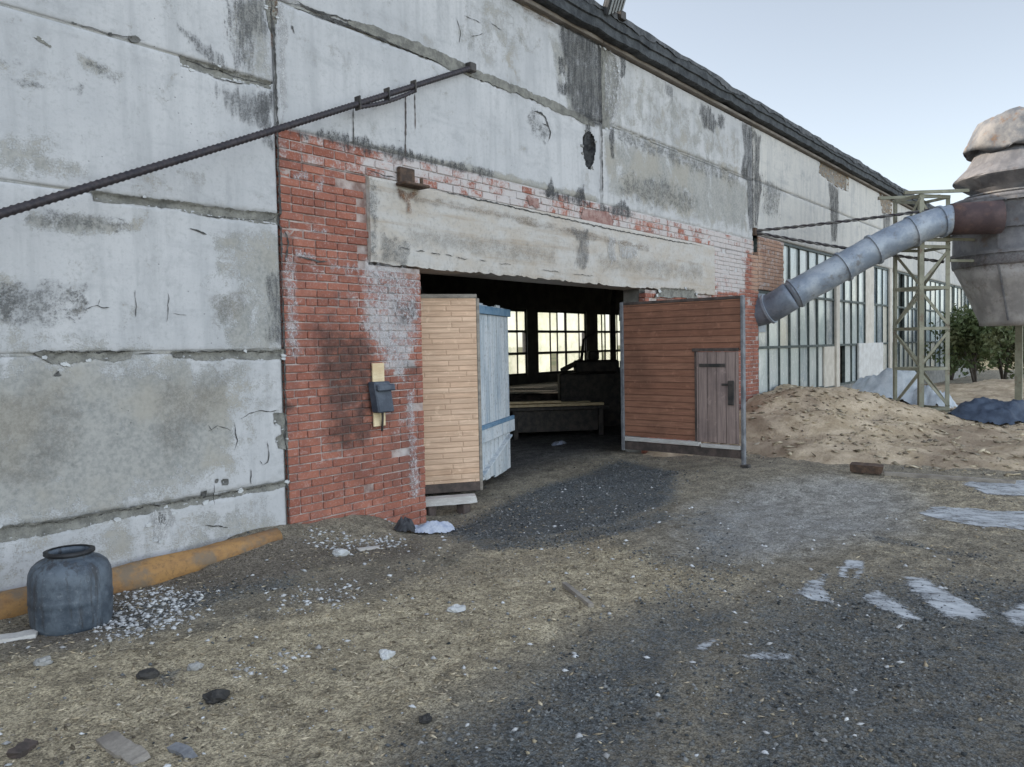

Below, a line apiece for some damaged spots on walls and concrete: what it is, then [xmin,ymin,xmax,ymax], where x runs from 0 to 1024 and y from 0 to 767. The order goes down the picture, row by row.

leakage [523,5,603,145]
leakage [216,86,273,147]
leakage [609,123,780,227]
spalling [819,164,849,191]
crack [430,188,700,246]
crack [12,0,409,528]
leakage [0,290,86,321]
leakage [331,186,421,497]
spalling [274,413,289,450]